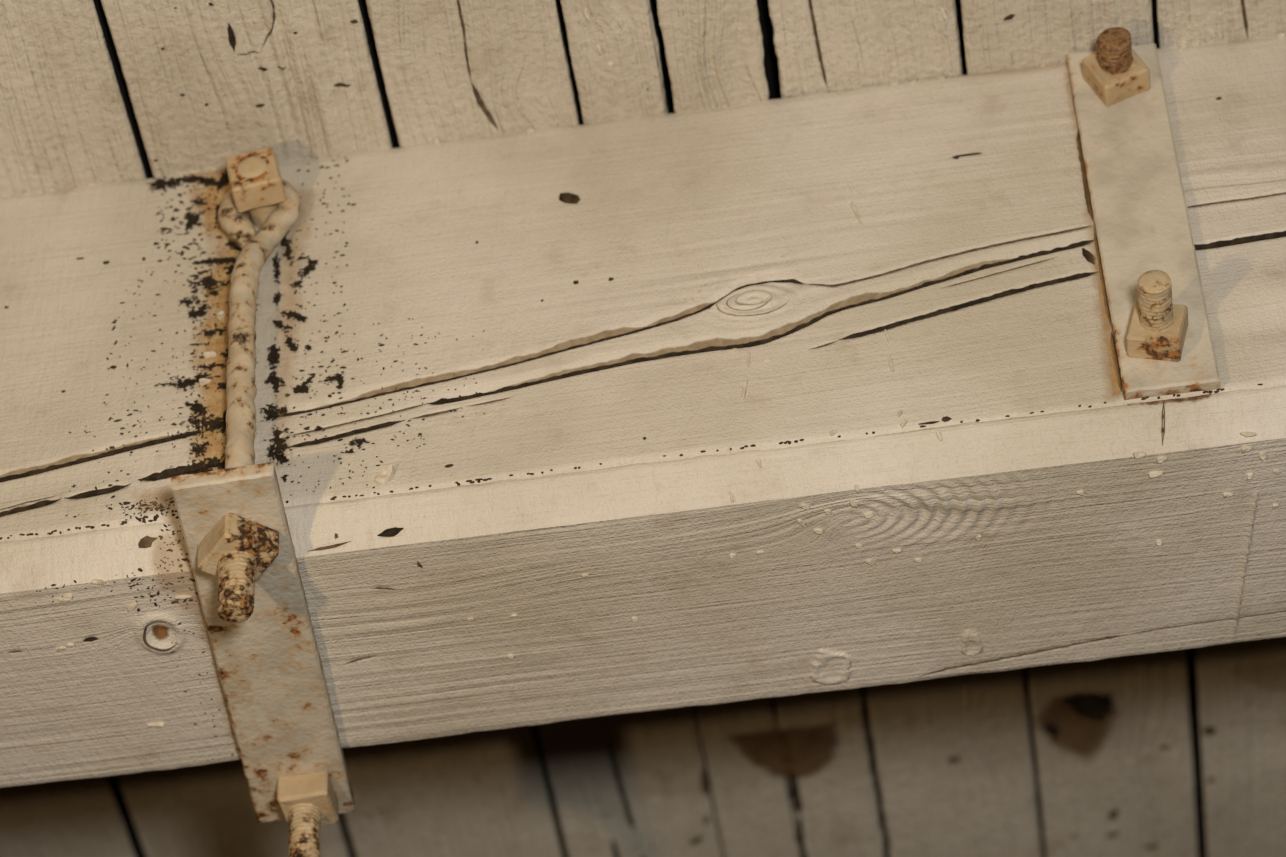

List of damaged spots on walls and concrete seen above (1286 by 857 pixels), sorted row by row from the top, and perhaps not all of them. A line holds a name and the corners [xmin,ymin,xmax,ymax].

crack [270,82,1122,447]
crack [1187,192,1286,208]
crack [1194,231,1286,250]
corrosion [199,172,239,464]
corrosion [1103,308,1209,405]
crack [0,429,210,516]
crack [83,635,98,643]